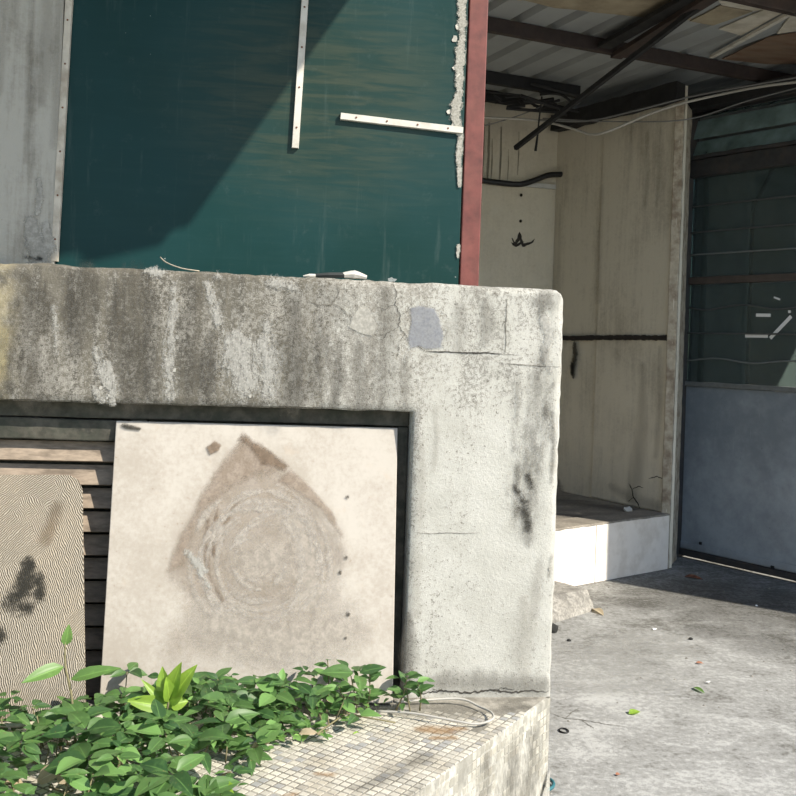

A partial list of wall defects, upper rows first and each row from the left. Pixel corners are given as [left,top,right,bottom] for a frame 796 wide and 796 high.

peeling [447,0,468,188]
crack [382,284,560,367]
crack [423,686,548,694]